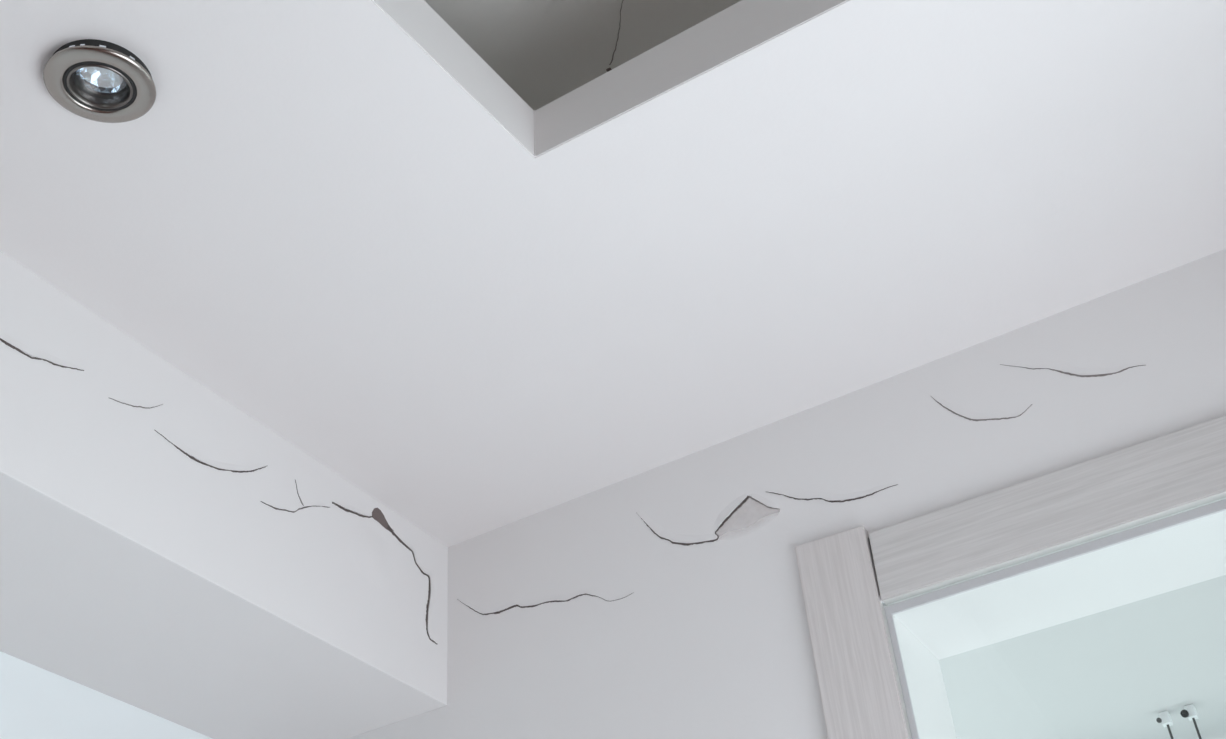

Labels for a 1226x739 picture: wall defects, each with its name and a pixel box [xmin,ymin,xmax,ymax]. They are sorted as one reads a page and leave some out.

crack [0,332,84,371]
crack [1000,362,1146,377]
crack [931,394,1032,421]
crack [109,396,267,473]
crack [766,482,898,503]
peeling [637,494,781,546]
crack [261,480,634,644]